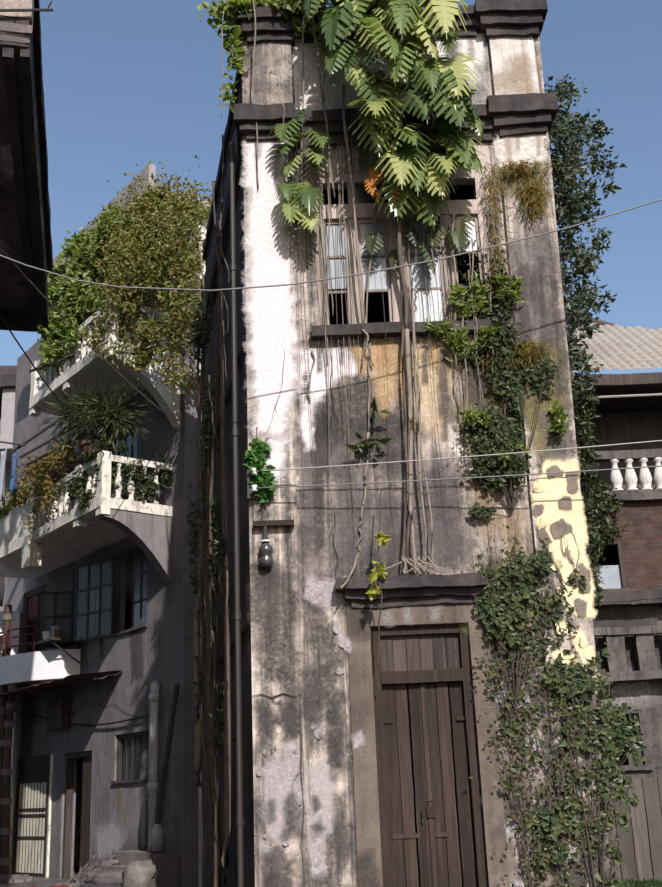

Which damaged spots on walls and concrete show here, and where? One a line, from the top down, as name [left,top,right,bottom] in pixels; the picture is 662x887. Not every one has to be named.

water stain [389,344,487,424]
water stain [298,375,458,568]
water stain [253,563,347,772]
crack [254,693,304,873]
water stain [264,847,295,887]
water stain [283,794,300,839]
water stain [335,796,349,866]